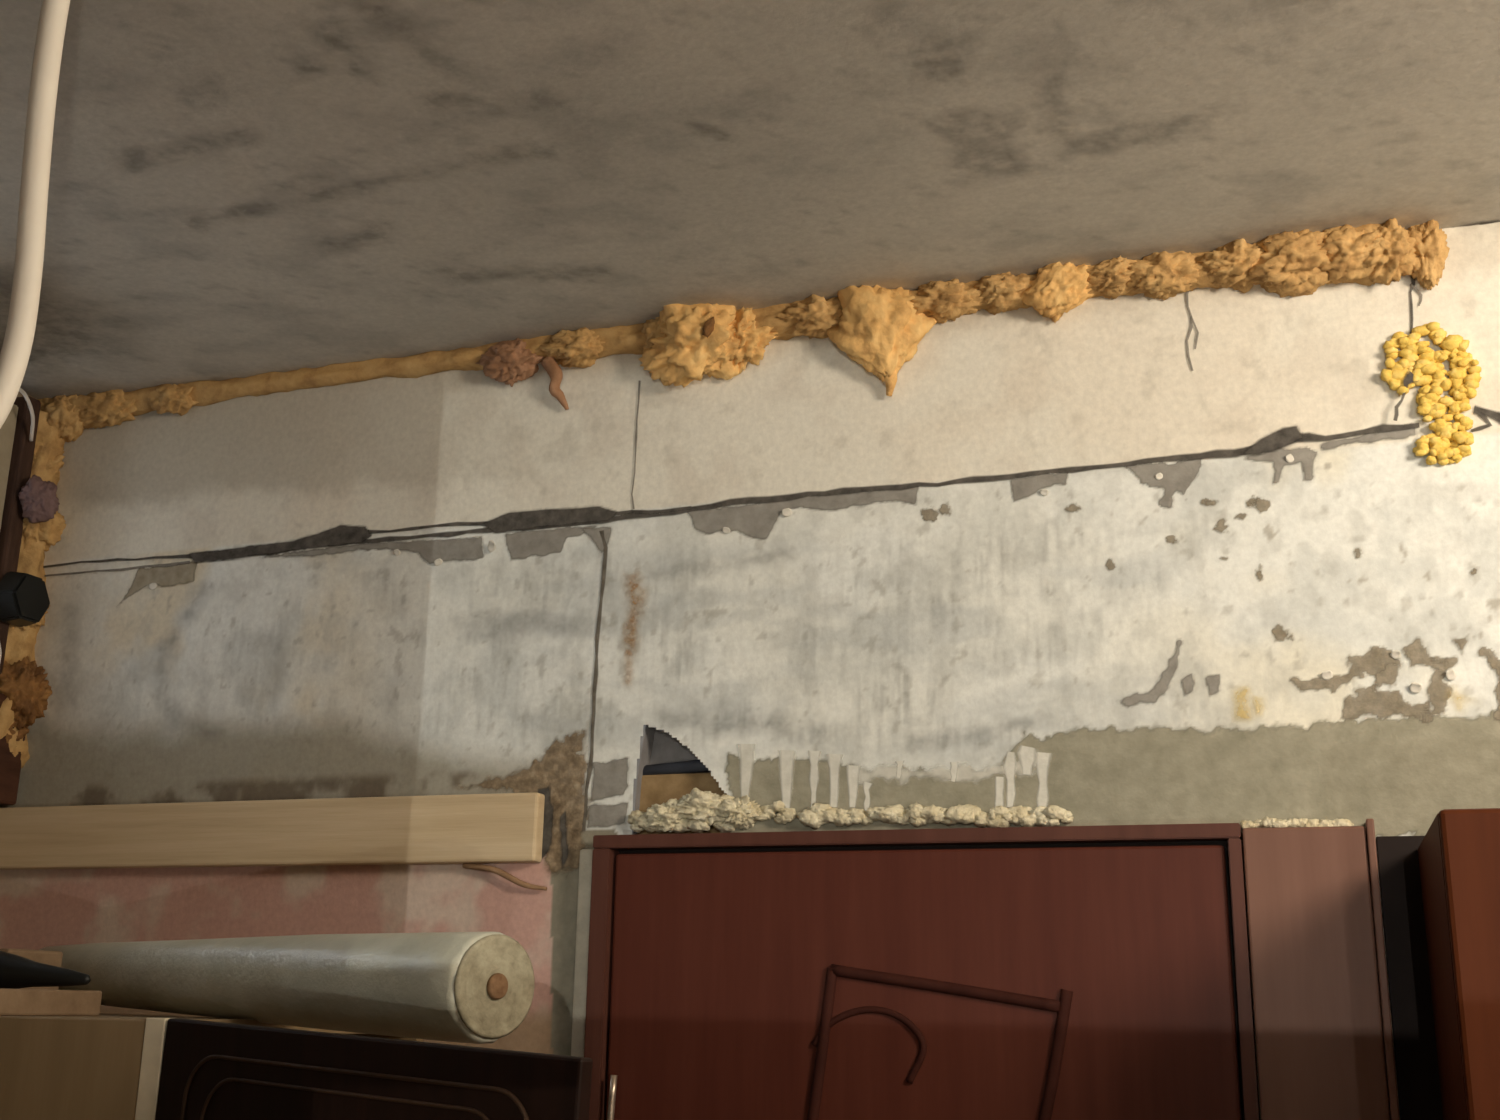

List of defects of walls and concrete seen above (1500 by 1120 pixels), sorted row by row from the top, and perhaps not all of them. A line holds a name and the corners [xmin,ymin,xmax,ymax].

crack [1410,275,1422,334]
crack [1471,406,1500,432]
peeling [1247,428,1416,483]
peeling [688,487,951,539]
peeling [1011,473,1068,501]
peeling [1126,459,1270,533]
crack [43,370,1420,831]
spalling [1272,624,1293,641]
spalling [460,638,1500,873]